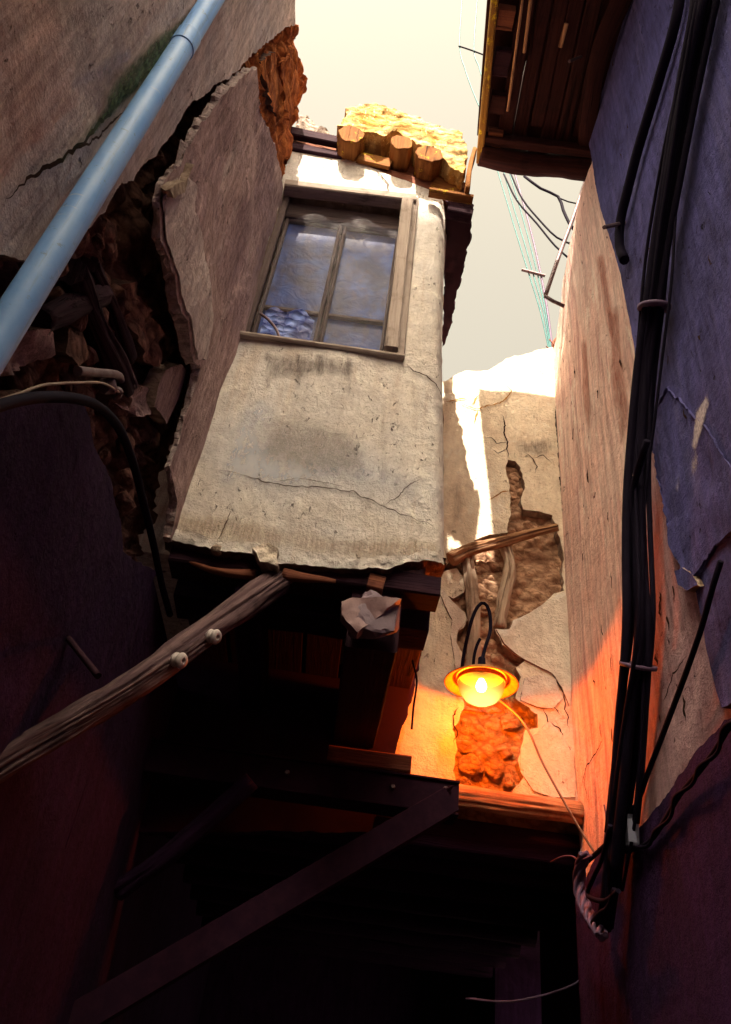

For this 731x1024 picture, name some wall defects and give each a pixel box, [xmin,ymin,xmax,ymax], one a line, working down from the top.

damp [108,25,180,110]
crack [5,109,125,200]
flaking render [0,24,308,561]
crack [219,470,431,525]
crack [410,367,562,501]
flaking render [652,386,731,629]
flaking render [162,467,576,798]